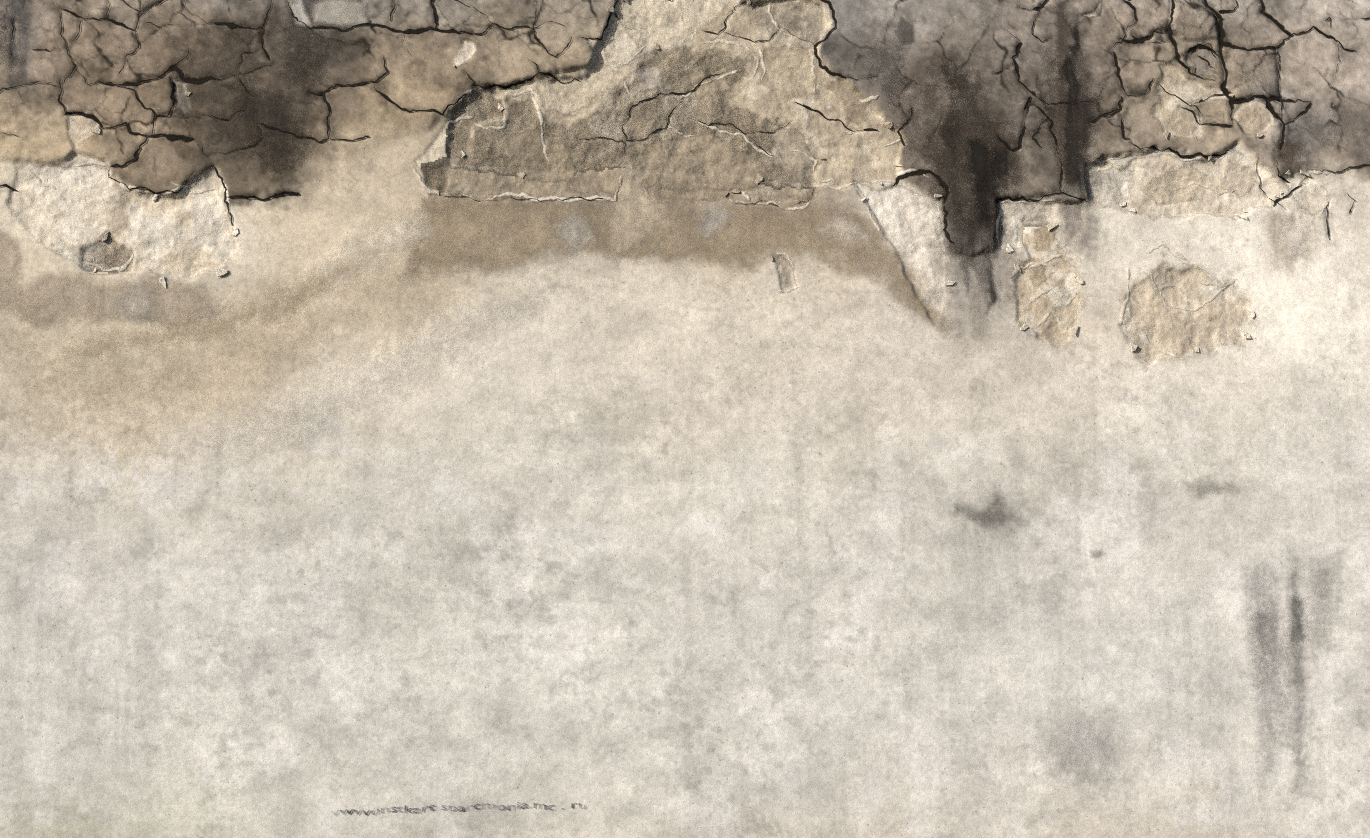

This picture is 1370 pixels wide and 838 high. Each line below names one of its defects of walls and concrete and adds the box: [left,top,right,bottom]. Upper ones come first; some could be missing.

peeling [7,111,241,288]
damp [0,233,270,337]
damp [177,0,368,174]
crack [0,0,637,226]
damp [290,167,941,326]
peeling [413,0,956,326]
crack [432,72,954,244]
crack [702,0,875,80]
damp [940,114,1007,333]
damp [1056,1,1094,243]
peeling [996,48,1328,363]
crack [995,0,1370,240]